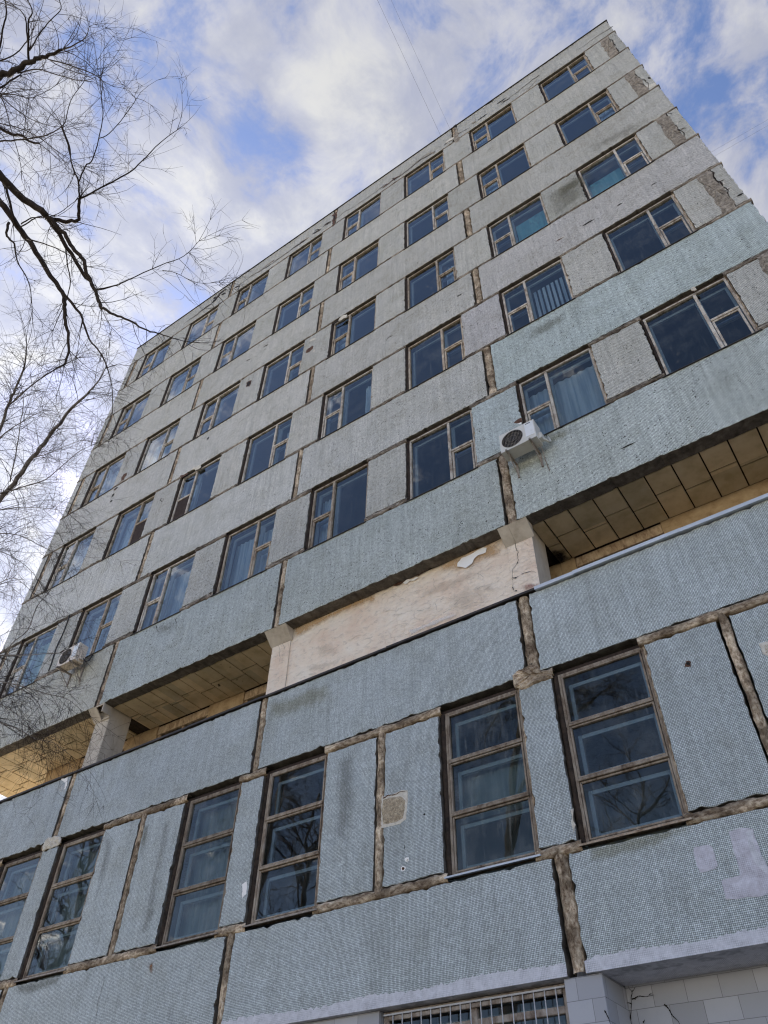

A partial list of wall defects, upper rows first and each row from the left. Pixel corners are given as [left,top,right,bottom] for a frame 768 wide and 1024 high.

spalling [624,70,656,97]
spalling [656,113,686,146]
flaking render [457,547,487,568]
spalling [381,790,408,828]